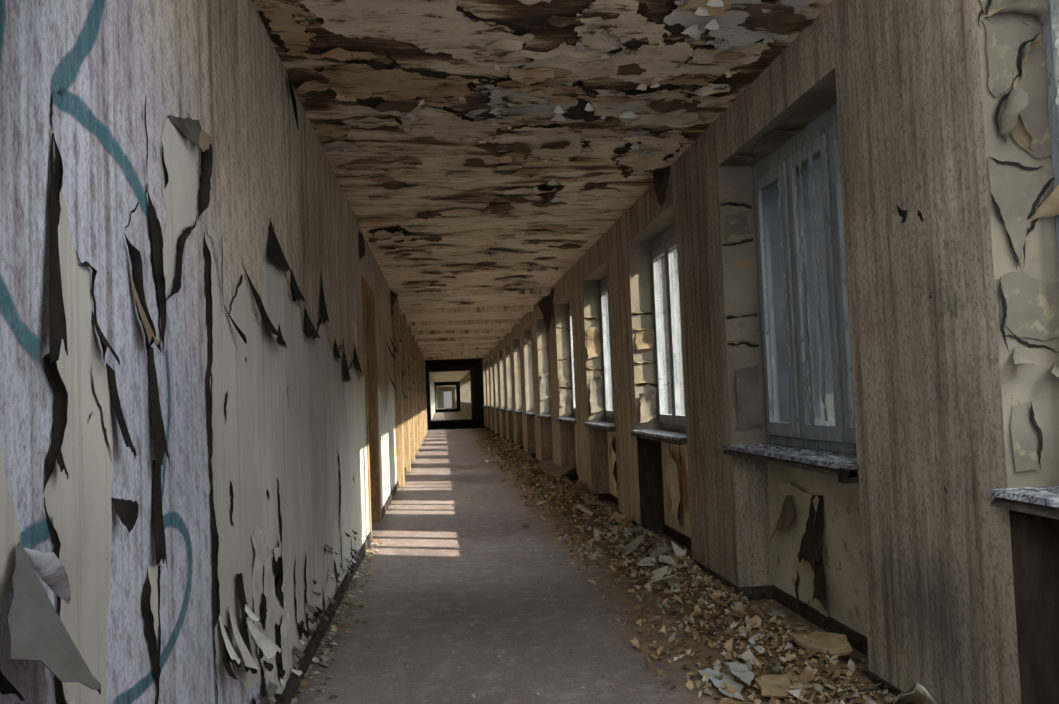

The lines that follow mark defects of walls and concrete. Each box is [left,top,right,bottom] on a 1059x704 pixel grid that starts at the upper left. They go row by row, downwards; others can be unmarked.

peeling [777,89,837,126]
peeling [357,218,586,306]
spalling [896,204,924,223]
peeling [980,0,1059,365]
crack [1016,203,1041,269]
flaking render [148,565,159,634]
spalling [218,525,361,704]